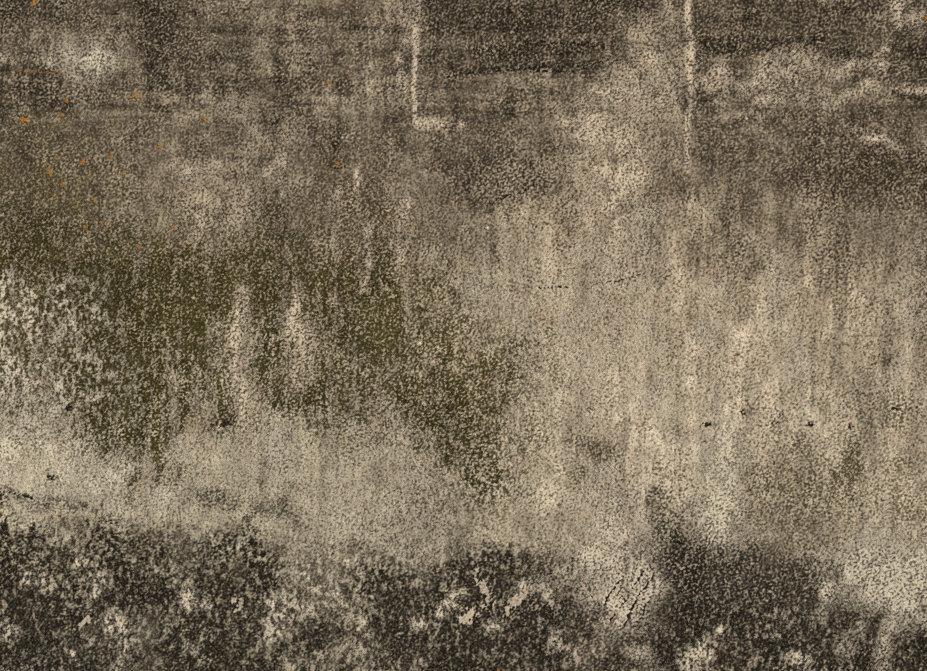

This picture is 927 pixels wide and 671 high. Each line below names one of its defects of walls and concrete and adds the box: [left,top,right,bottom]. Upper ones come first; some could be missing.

water stain [397,198,412,226]
water stain [469,264,510,314]
water stain [0,269,327,671]
water stain [300,472,385,545]
water stain [353,545,597,671]
water stain [640,420,927,671]